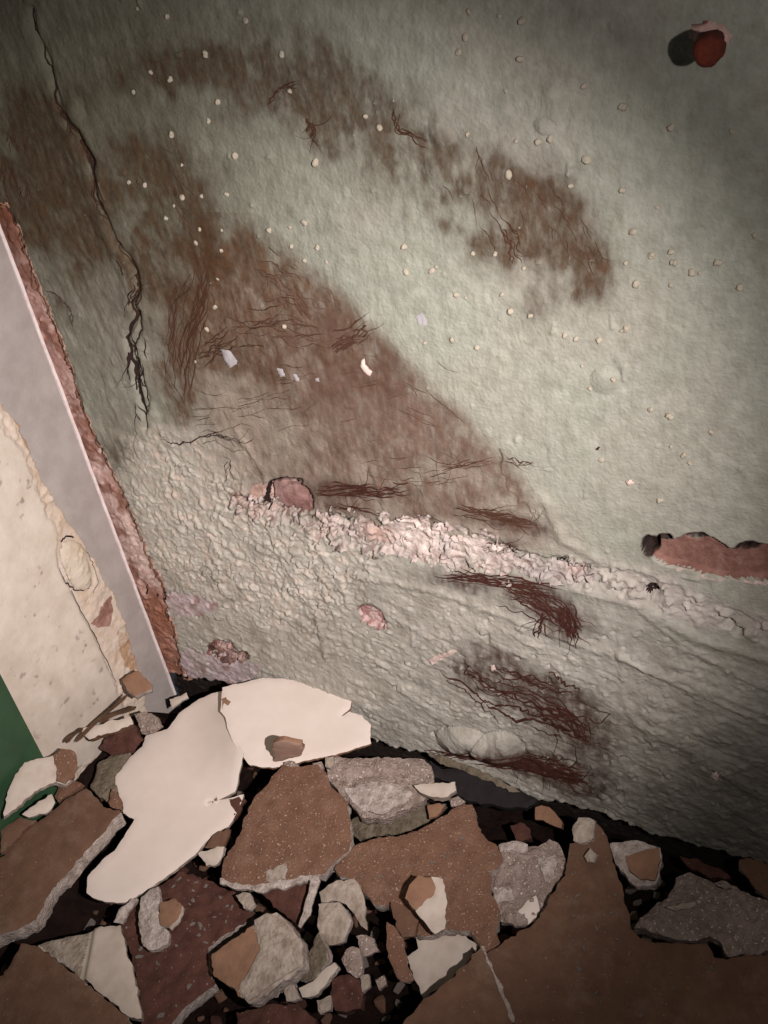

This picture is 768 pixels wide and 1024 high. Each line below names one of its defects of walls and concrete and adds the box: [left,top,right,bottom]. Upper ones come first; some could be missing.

crack [32,8,253,484]
flaking render [0,202,262,685]
rust [316,469,408,516]
flaking render [229,476,596,587]
rust [442,455,545,473]
rust [454,505,545,554]
flaking render [652,532,768,585]
flaking render [357,604,387,630]
rust [434,567,597,659]
rust [424,652,610,797]